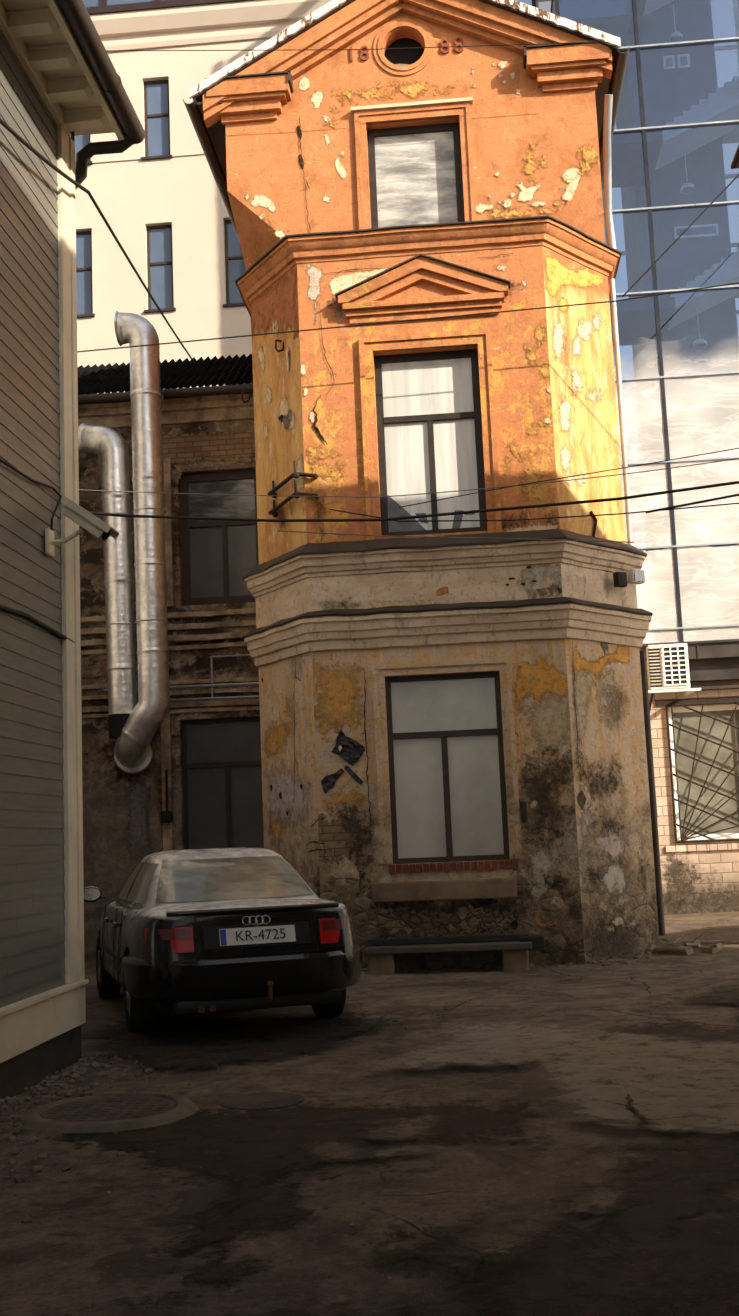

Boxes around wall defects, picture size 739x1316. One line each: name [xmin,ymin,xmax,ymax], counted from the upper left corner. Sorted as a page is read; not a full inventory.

peeling [245,194,290,239]
crack [299,117,311,231]
peeling [476,136,600,219]
flaking render [162,264,388,483]
crack [312,268,380,445]
peeling [501,256,605,532]
flaking render [506,563,562,592]
peeling [513,642,631,760]
damp [331,797,374,885]
damp [519,746,624,853]
damp [370,891,527,938]
damp [539,867,641,965]